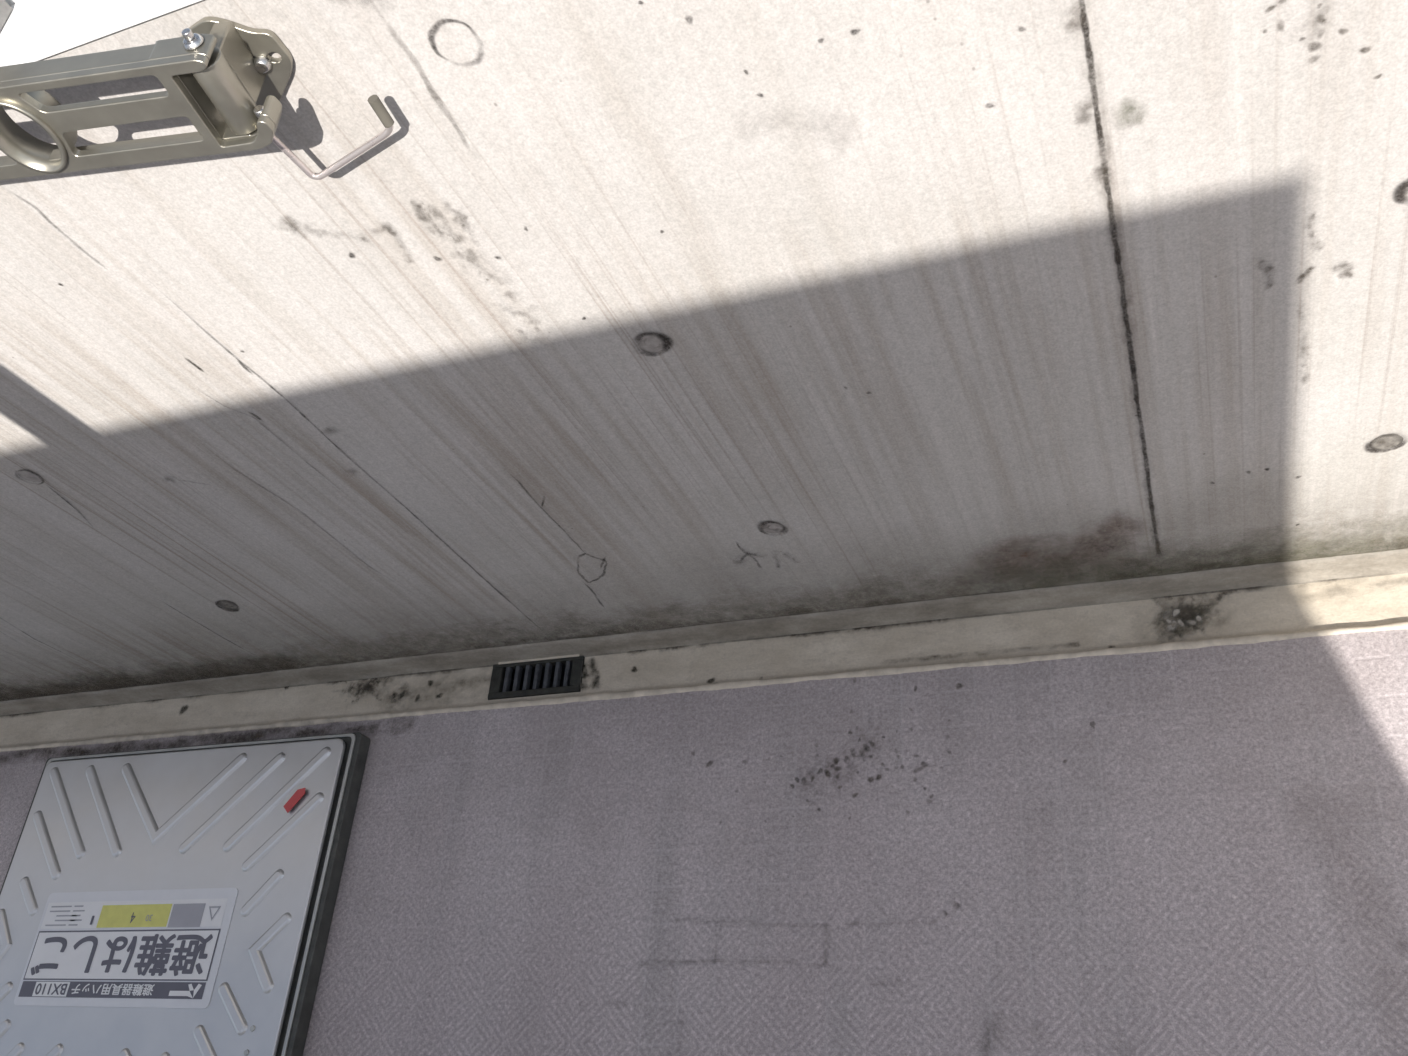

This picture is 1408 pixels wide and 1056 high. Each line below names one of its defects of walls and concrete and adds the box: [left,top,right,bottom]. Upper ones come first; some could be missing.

crack [1081,4,1160,554]